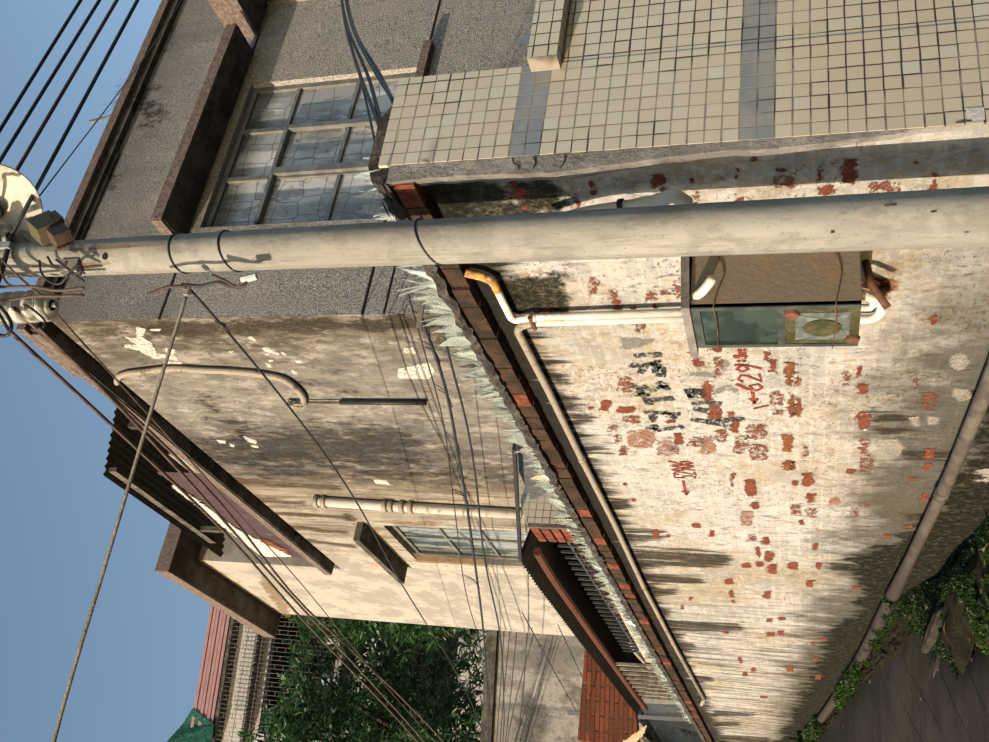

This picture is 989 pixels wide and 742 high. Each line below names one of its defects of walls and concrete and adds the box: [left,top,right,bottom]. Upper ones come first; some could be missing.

damp [441,180,575,218]
spalling [817,159,860,196]
rust [464,269,501,294]
spalling [588,277,681,310]
peeling [124,327,182,365]
damp [149,314,461,337]
spalling [587,348,817,525]
spalling [845,412,875,475]
spalling [728,473,798,574]
damp [899,406,989,595]
damp [622,528,743,652]
damp [709,513,924,742]